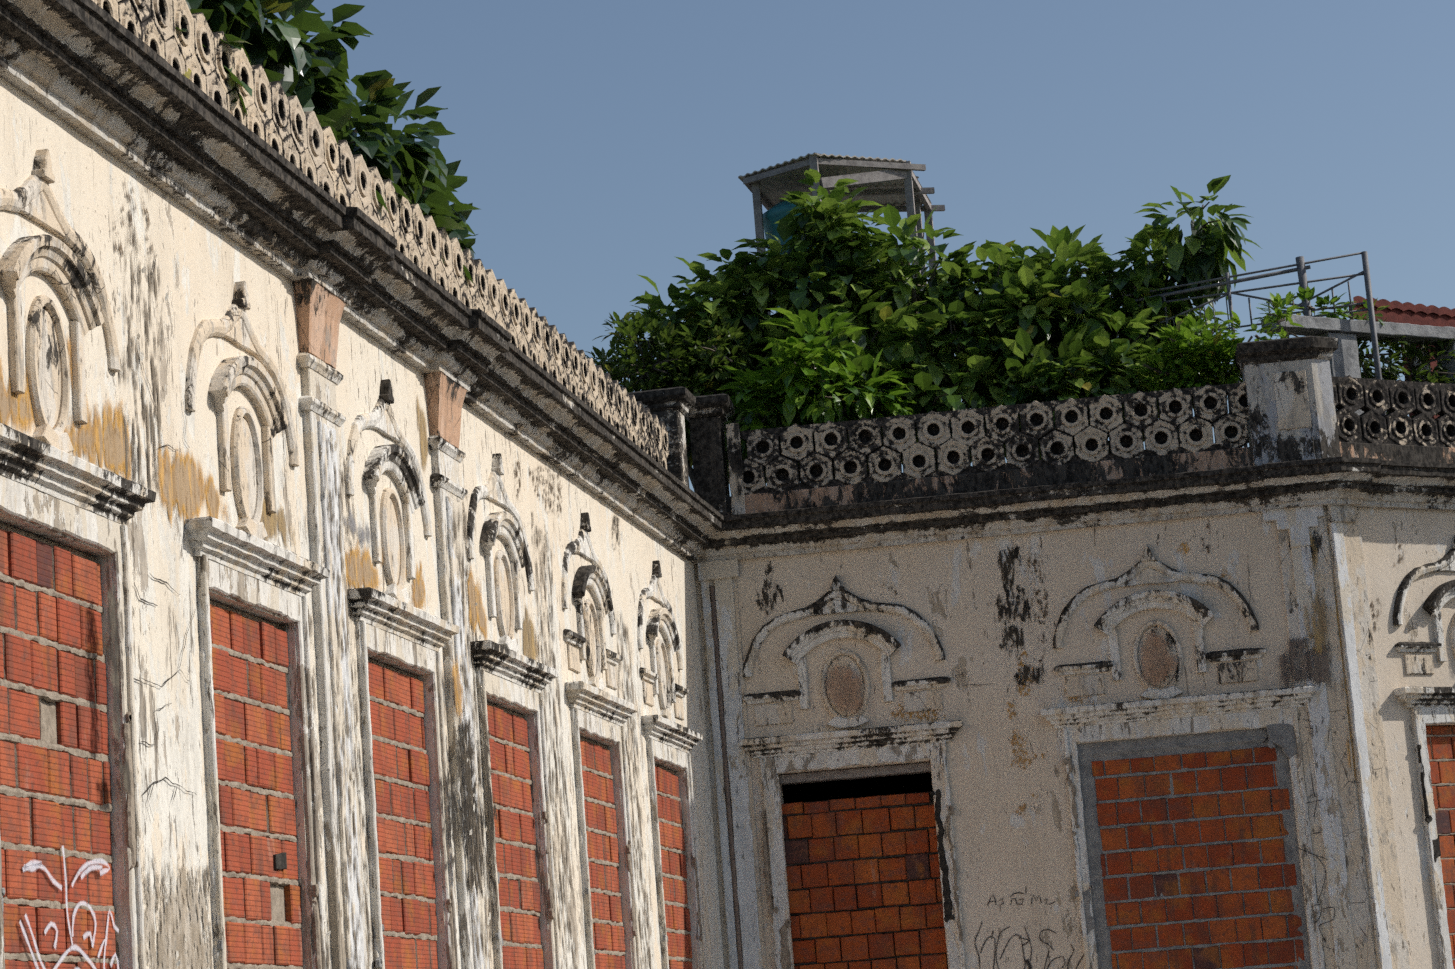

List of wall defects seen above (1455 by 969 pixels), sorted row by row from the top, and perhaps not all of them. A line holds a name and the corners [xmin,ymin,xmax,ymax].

leakage [362,398,428,514]
leakage [479,462,562,572]
leakage [995,545,1048,689]
leakage [1279,532,1330,688]
leakage [444,711,498,898]